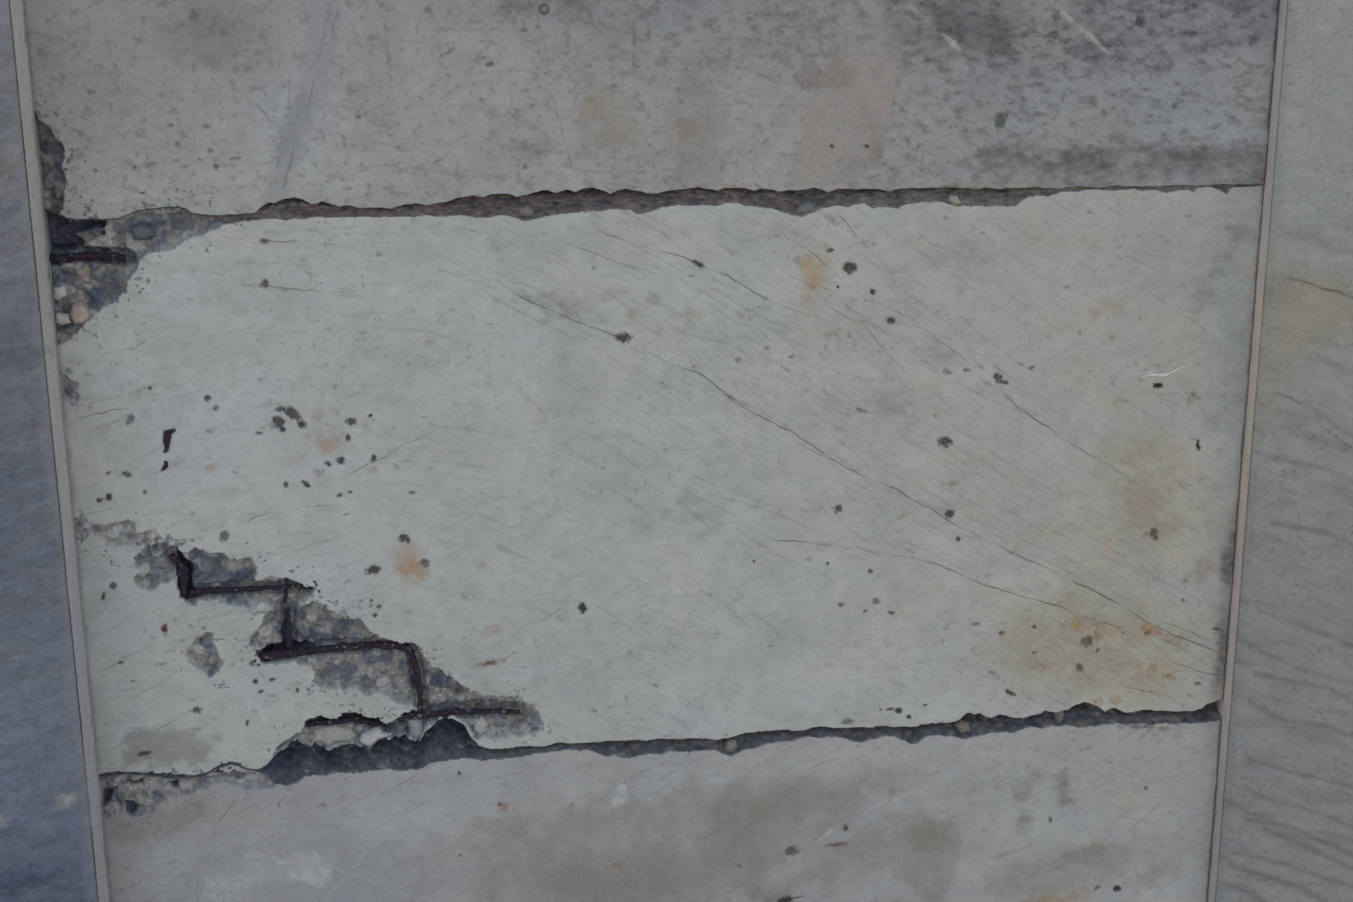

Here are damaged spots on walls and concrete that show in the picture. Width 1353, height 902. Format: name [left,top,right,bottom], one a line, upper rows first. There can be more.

spalling [34,95,242,347]
spalling [60,362,92,412]
spalling [74,494,553,831]